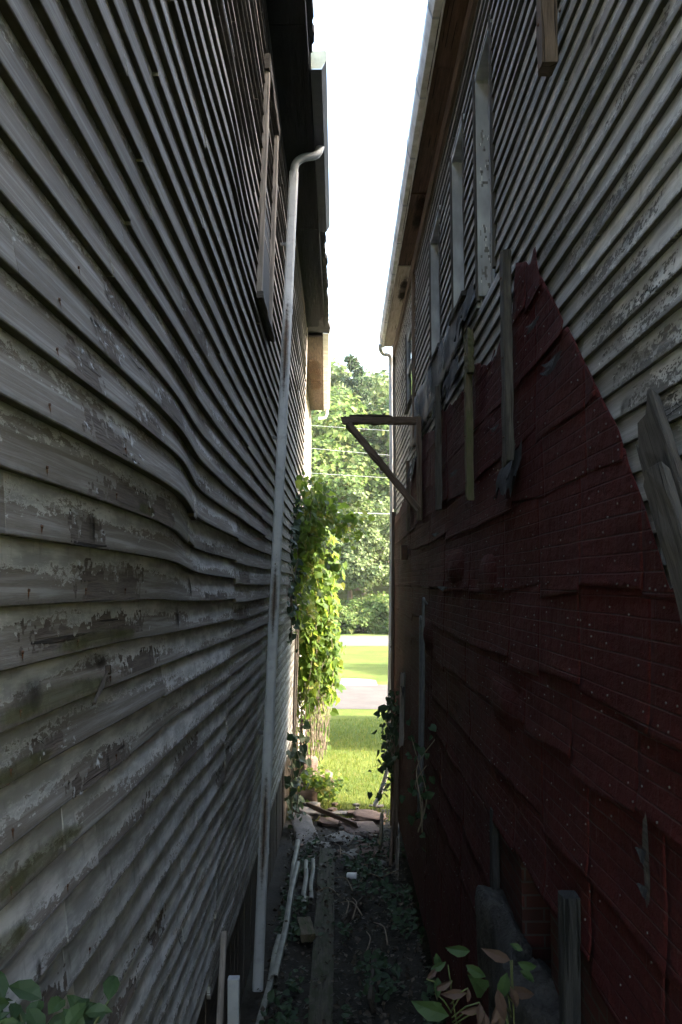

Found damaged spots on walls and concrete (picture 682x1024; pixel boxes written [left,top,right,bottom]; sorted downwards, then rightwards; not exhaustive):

peeling [564,165,636,274]
peeling [581,188,678,353]
peeling [611,317,682,421]
peeling [86,471,176,530]
peeling [14,509,150,657]
peeling [118,645,162,678]
peeling [62,738,132,799]
peeling [105,904,166,1024]